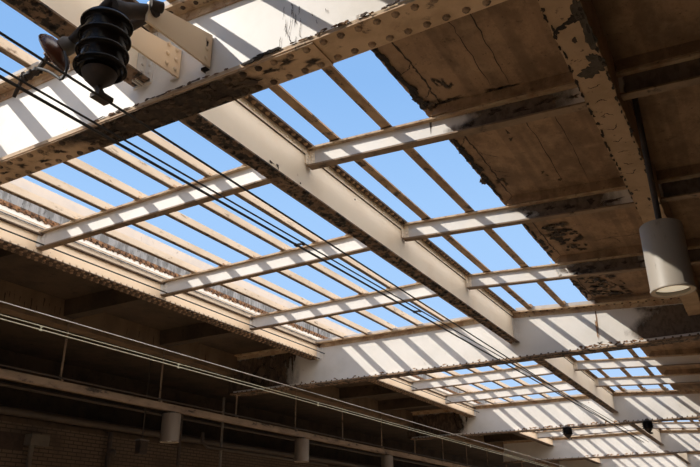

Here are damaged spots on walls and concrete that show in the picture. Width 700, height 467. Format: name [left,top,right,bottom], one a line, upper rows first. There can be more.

corrosion [94,68,228,121]
corrosion [241,47,281,66]
spalling [372,47,429,110]
crack [448,14,509,86]
peeling [538,0,646,209]
spalling [450,139,504,201]
peeling [522,222,631,298]